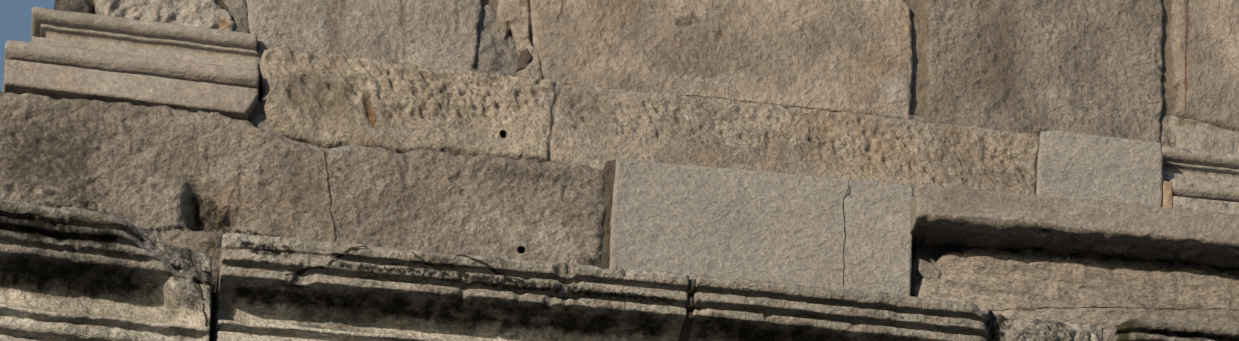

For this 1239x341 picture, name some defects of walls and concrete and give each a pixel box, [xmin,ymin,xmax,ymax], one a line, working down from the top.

damp [0,133,117,248]
damp [0,254,155,298]
damp [143,193,294,258]
crack [285,151,368,282]
crack [412,252,531,285]
crack [843,185,851,289]
spalling [1013,322,1070,341]